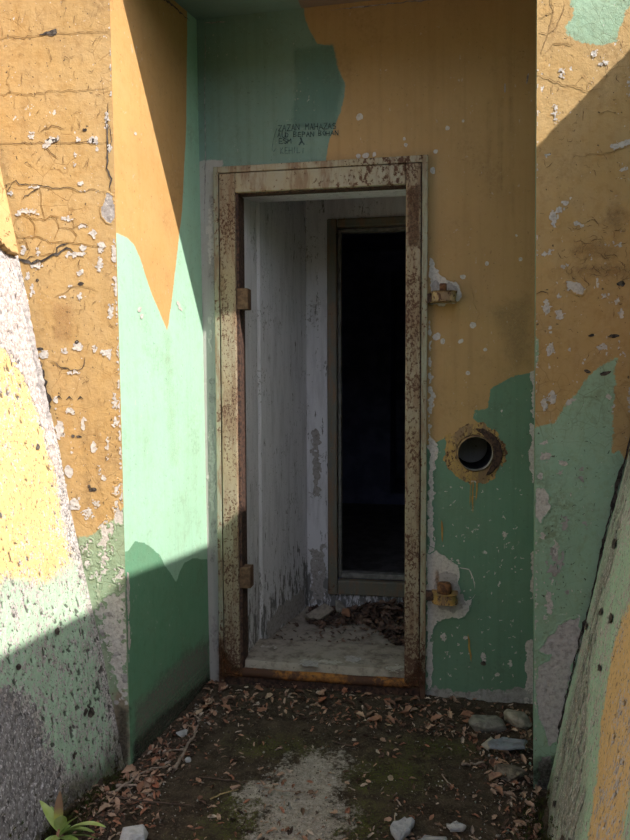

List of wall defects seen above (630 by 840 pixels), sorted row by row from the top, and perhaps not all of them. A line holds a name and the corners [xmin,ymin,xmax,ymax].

crack [538,4,572,53]
crack [539,62,630,181]
crack [0,1,118,413]
peeling [61,215,118,325]
crack [539,217,630,318]
spalling [0,244,87,486]
peeling [61,337,119,370]
peeling [69,380,131,708]
rust [218,641,242,678]
peeling [425,279,630,840]
crack [541,438,630,744]
peeling [0,684,70,840]